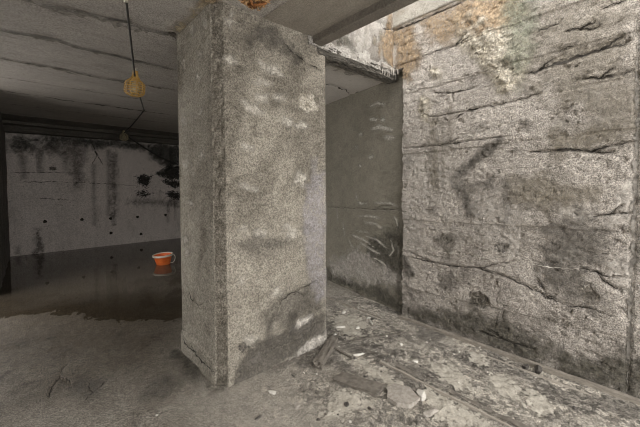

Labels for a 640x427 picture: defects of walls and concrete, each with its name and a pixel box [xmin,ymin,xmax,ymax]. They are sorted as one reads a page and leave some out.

leakage [12,135,179,185]
crack [403,20,640,391]